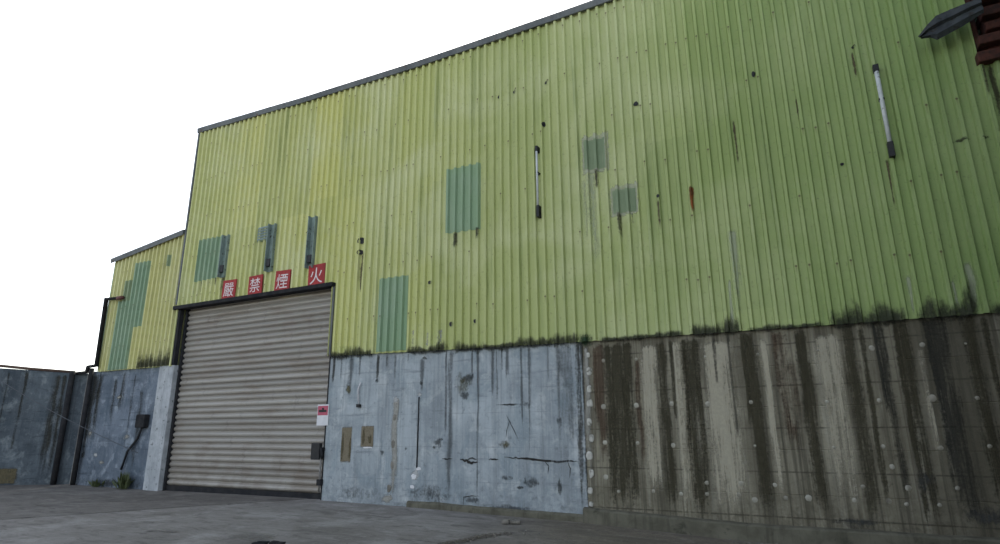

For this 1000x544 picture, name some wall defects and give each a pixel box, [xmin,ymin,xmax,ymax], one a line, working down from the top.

leakage [330,347,380,393]
leakage [407,332,588,498]
leakage [602,278,1000,522]